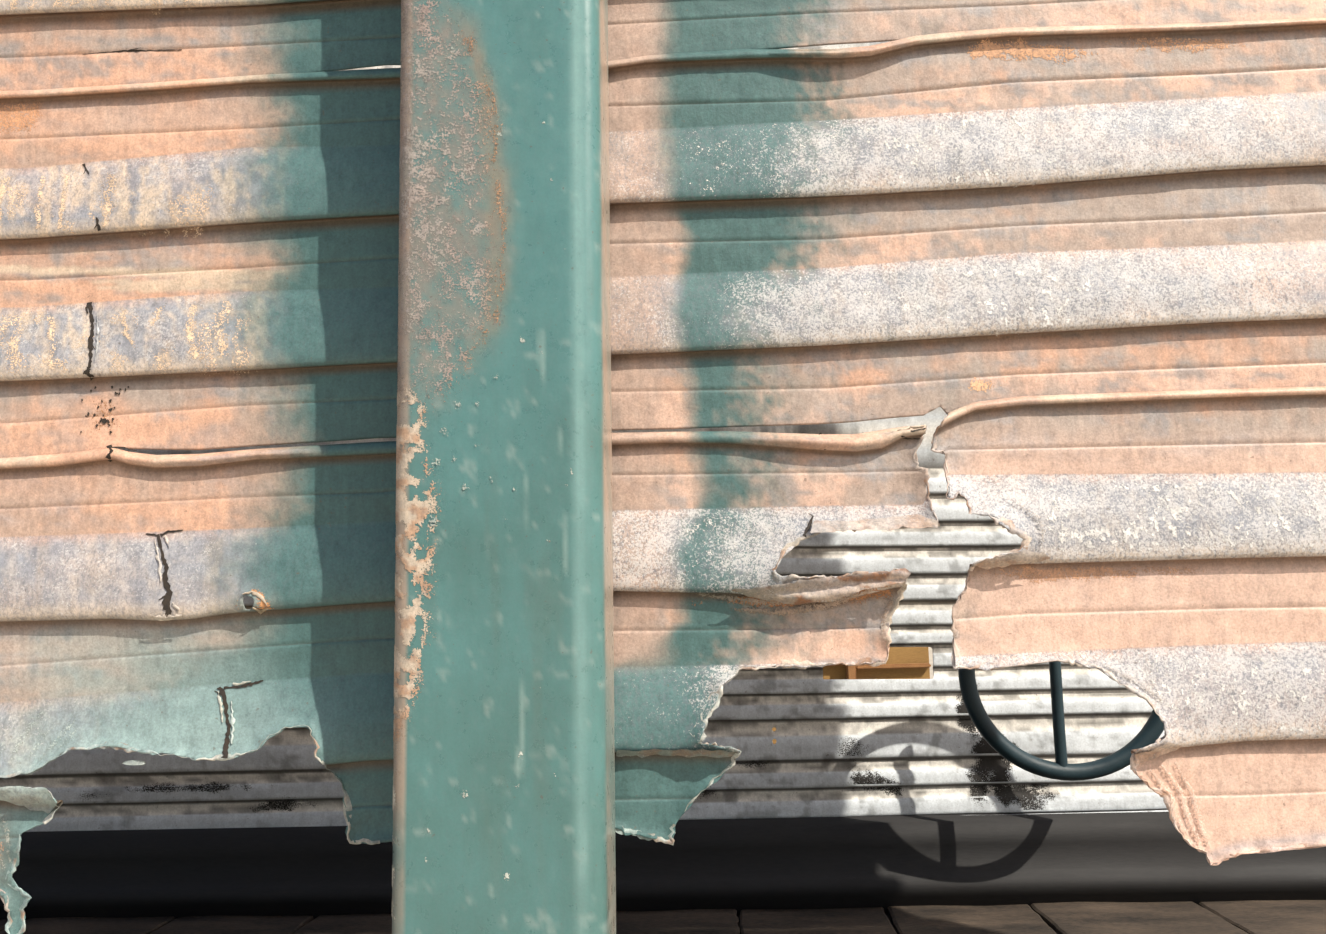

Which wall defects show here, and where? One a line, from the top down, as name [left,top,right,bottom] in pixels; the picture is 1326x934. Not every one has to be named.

corrosion [397,0,508,417]
crack [83,302,99,380]
crack [146,530,183,621]
peeling [393,380,456,810]
peeling [684,517,793,585]
peeling [1042,480,1326,553]
crack [215,680,263,758]
peeling [1126,651,1325,734]